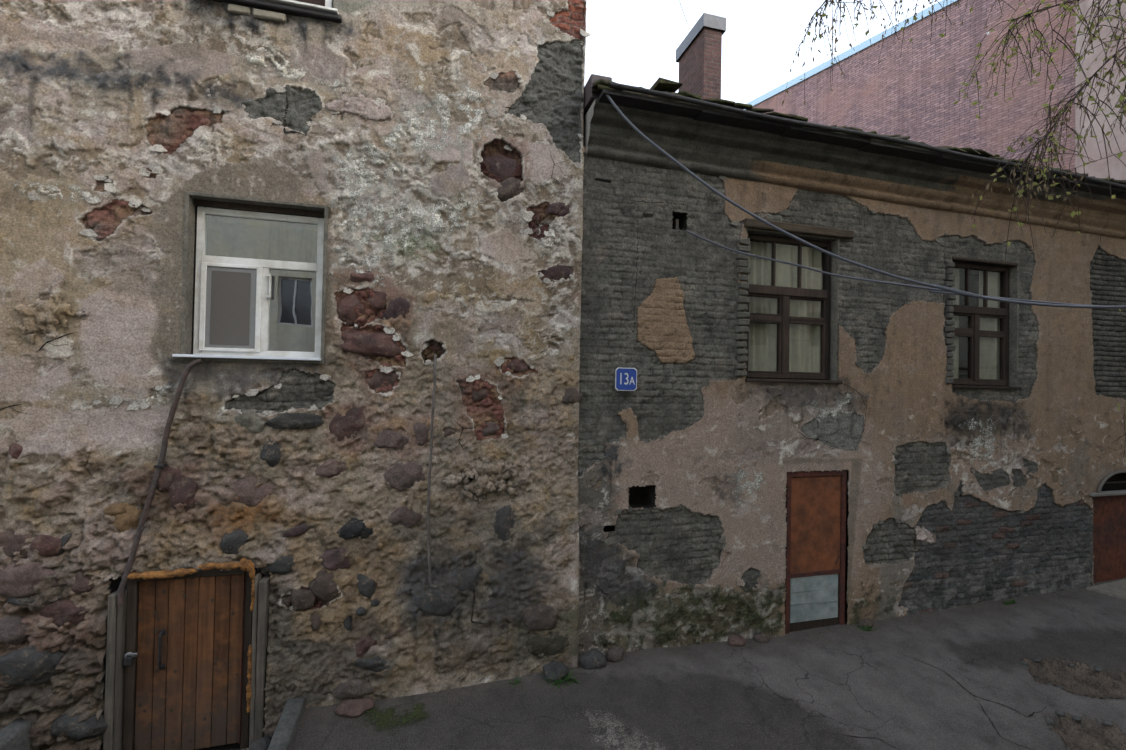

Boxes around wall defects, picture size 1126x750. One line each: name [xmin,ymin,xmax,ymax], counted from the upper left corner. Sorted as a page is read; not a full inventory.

peeling [241,41,452,134]
spalling [15,175,151,241]
spalling [139,106,224,178]
spalling [476,139,523,184]
flaking render [484,0,1039,476]
spalling [335,285,445,393]
flaking render [1089,246,1126,400]
spalling [457,375,509,441]
flaking render [603,485,726,586]
flaking render [862,442,1093,615]